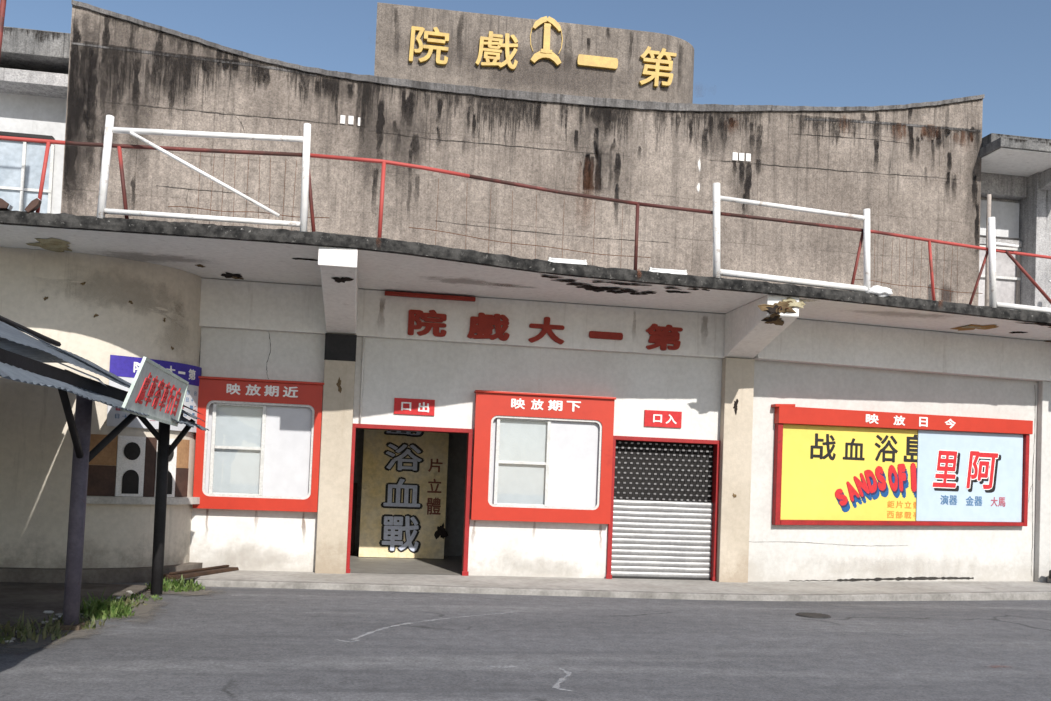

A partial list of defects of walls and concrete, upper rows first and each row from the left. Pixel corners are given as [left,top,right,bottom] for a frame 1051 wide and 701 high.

damp [4,17,547,195]
damp [561,103,632,208]
damp [655,110,763,146]
damp [733,160,761,207]
damp [791,108,982,188]
damp [972,176,980,244]
peeling [542,276,710,295]